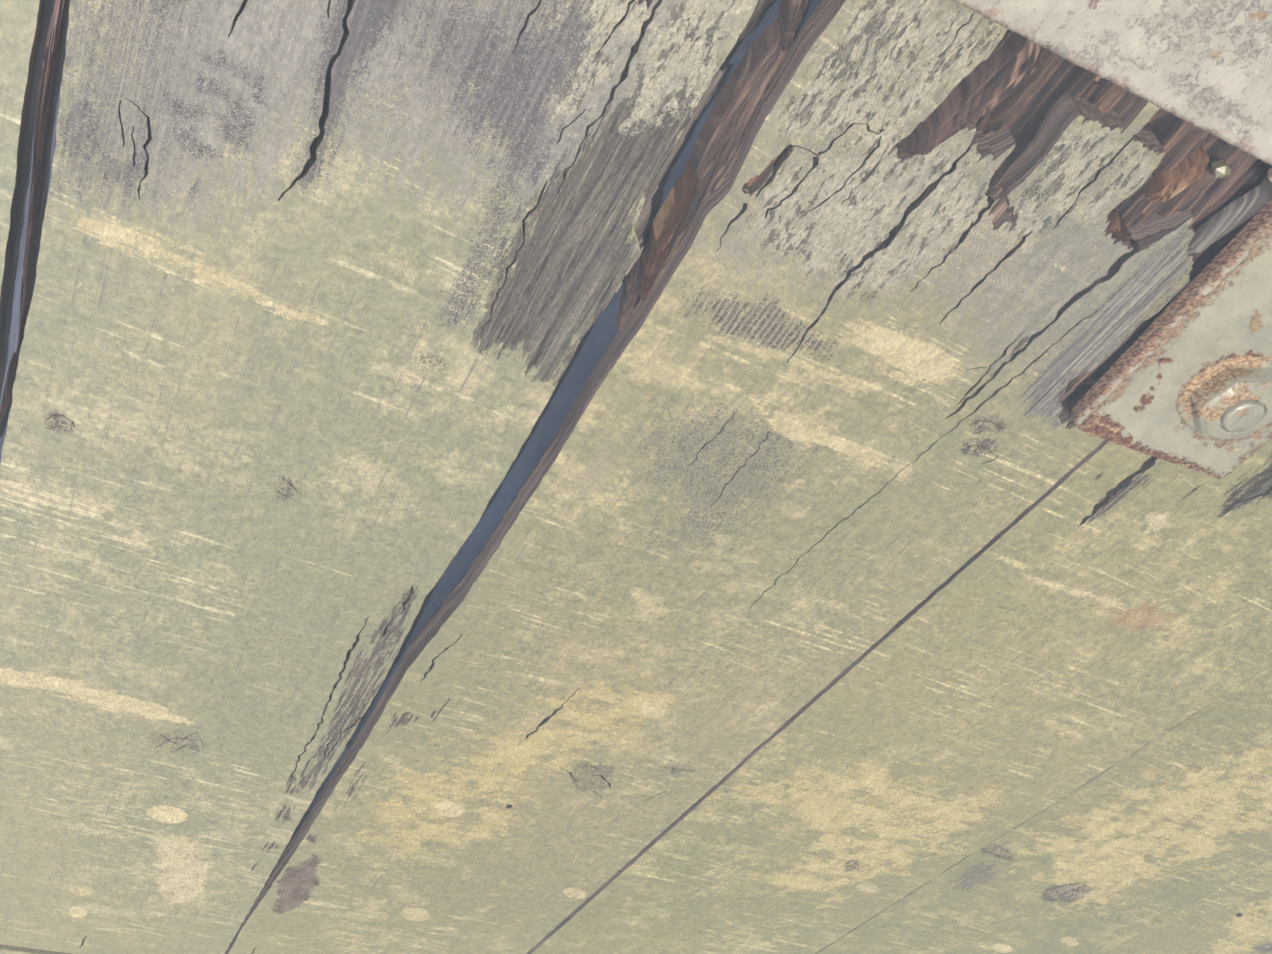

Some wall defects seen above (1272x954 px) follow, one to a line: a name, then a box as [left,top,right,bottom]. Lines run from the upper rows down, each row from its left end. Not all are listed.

crack [278,0,356,201]
leakage [281,0,609,333]
crack [717,123,886,251]
crack [788,146,971,361]
crack [909,196,995,292]
crack [939,134,1136,324]
peeling [996,121,1165,256]
spalling [1043,0,1272,143]
peeling [1211,160,1231,178]
crack [750,240,1141,608]
rust [1078,226,1272,479]
crack [291,586,413,778]